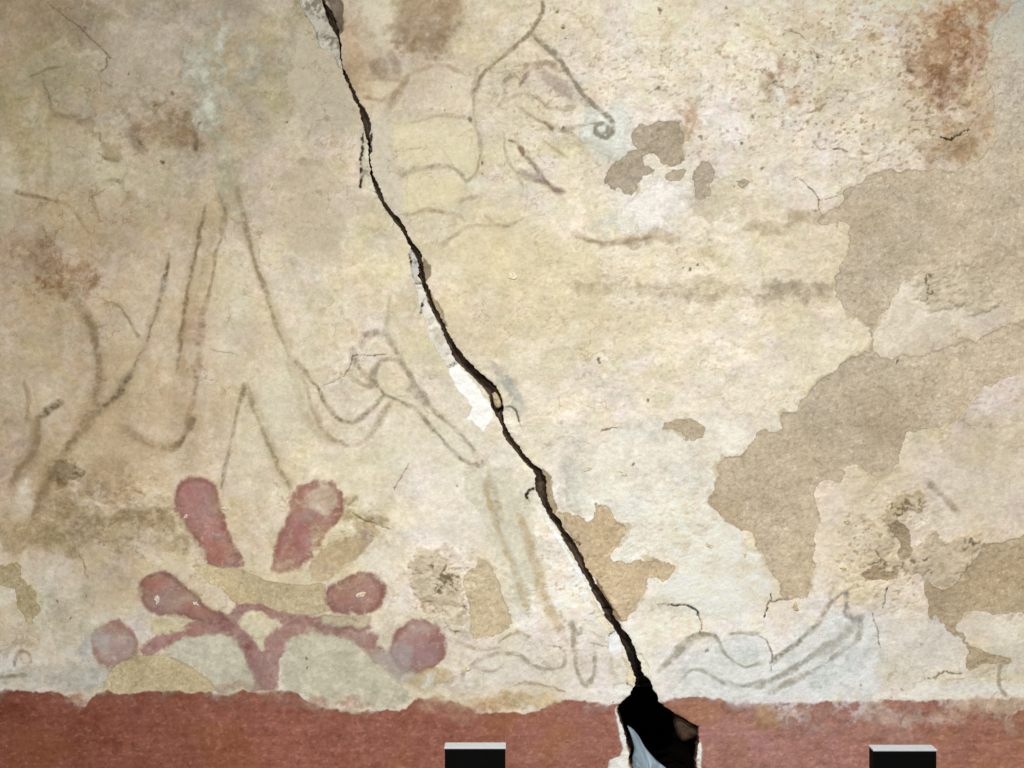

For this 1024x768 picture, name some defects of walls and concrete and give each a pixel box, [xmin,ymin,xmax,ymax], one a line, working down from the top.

spalling [604,120,715,199]
crack [300,0,654,691]
spalling [708,0,1024,611]
spalling [662,419,705,441]
spalling [412,547,512,639]
spalling [556,503,675,621]
spalling [862,491,1024,671]